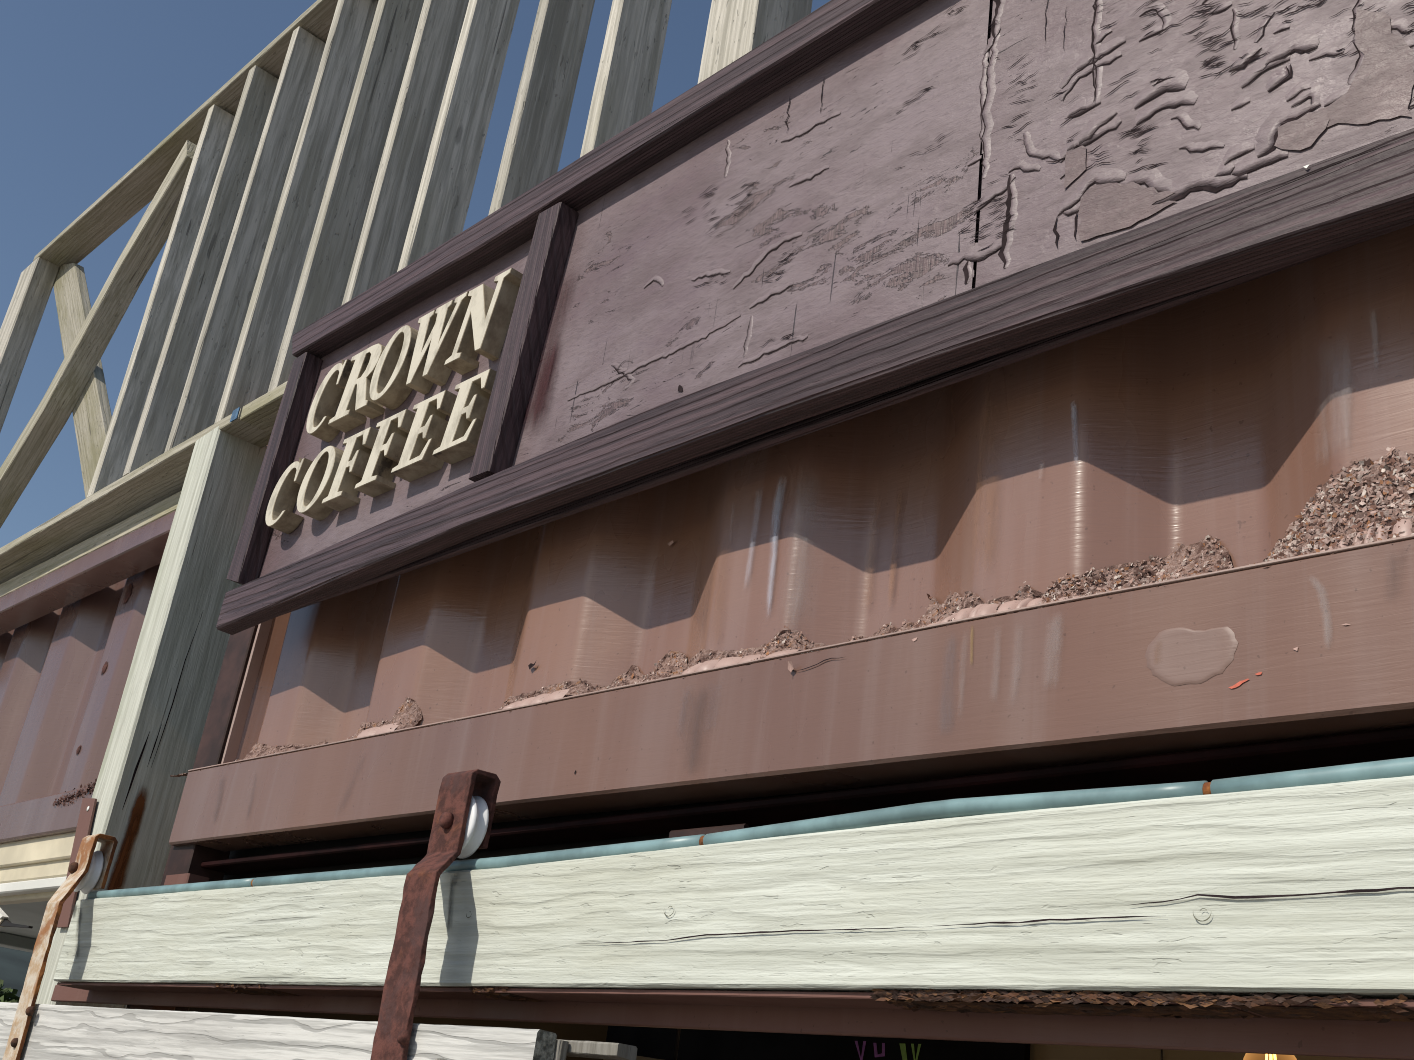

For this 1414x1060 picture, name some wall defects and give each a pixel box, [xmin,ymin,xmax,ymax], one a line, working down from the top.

crack [781,80,841,143]
crack [896,86,933,114]
crack [902,0,1414,284]
crack [567,140,829,401]
crack [577,906,904,944]
crack [938,887,1414,926]